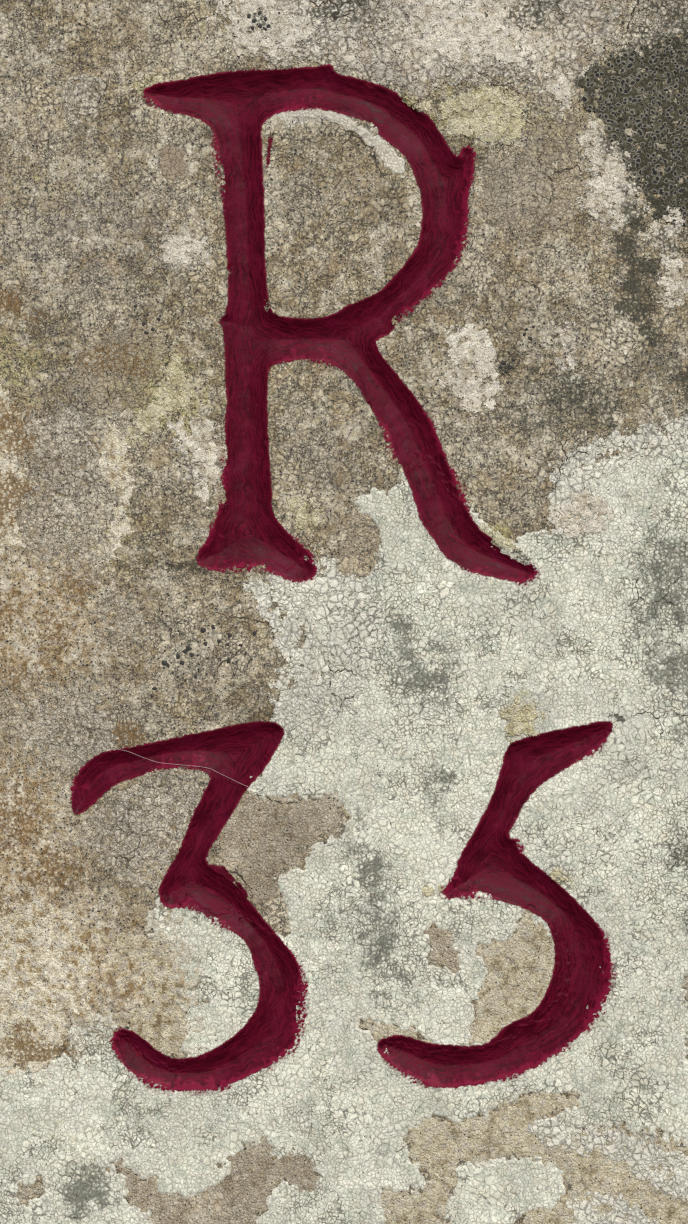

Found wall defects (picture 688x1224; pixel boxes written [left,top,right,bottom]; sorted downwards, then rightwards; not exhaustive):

leakage [569,0,688,346]
crack [554,432,589,493]
crack [628,574,684,616]
crack [212,612,278,683]
crack [328,661,358,714]
crack [631,709,688,742]
crack [230,868,253,899]